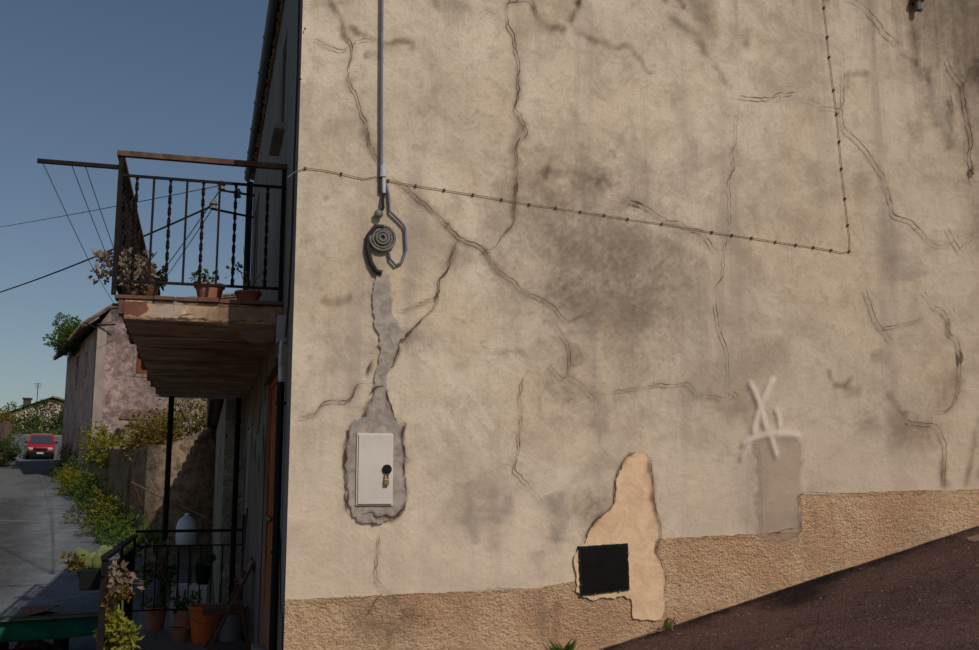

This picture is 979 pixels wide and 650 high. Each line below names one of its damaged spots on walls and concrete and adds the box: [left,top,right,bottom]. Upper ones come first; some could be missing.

crack [298,0,975,618]
peeling [237,426,265,649]
peeling [574,452,666,621]